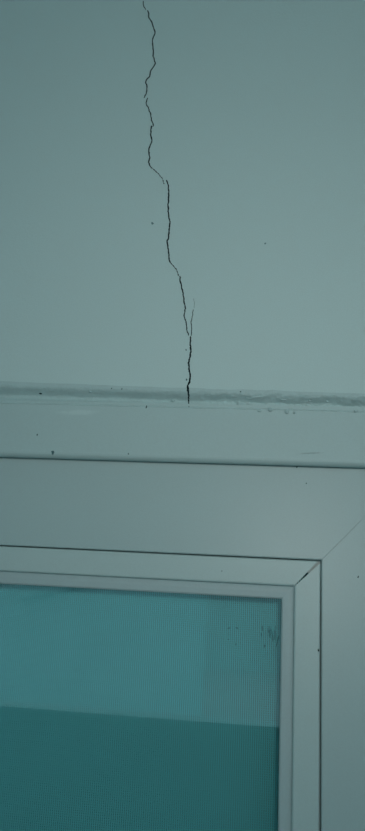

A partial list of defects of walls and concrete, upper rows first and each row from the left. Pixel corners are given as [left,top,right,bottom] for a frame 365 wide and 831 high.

crack [143,1,195,407]